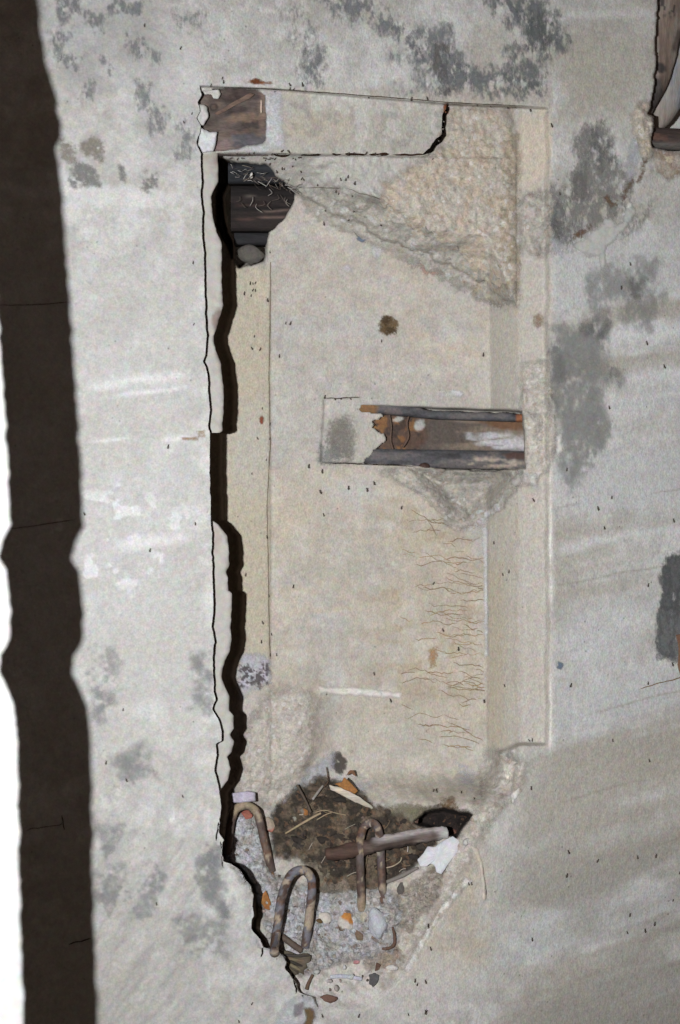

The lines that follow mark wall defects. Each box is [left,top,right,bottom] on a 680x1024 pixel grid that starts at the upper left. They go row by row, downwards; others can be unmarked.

leakage [307,47,324,82]
leakage [327,0,571,100]
crack [196,86,538,433]
spalling [295,103,553,305]
leakage [549,120,639,251]
crack [333,461,413,469]
spalling [382,361,563,531]
leakage [551,315,619,482]
crack [401,510,485,751]
leakage [655,555,680,661]
crack [211,521,318,1007]
spalling [377,748,525,987]